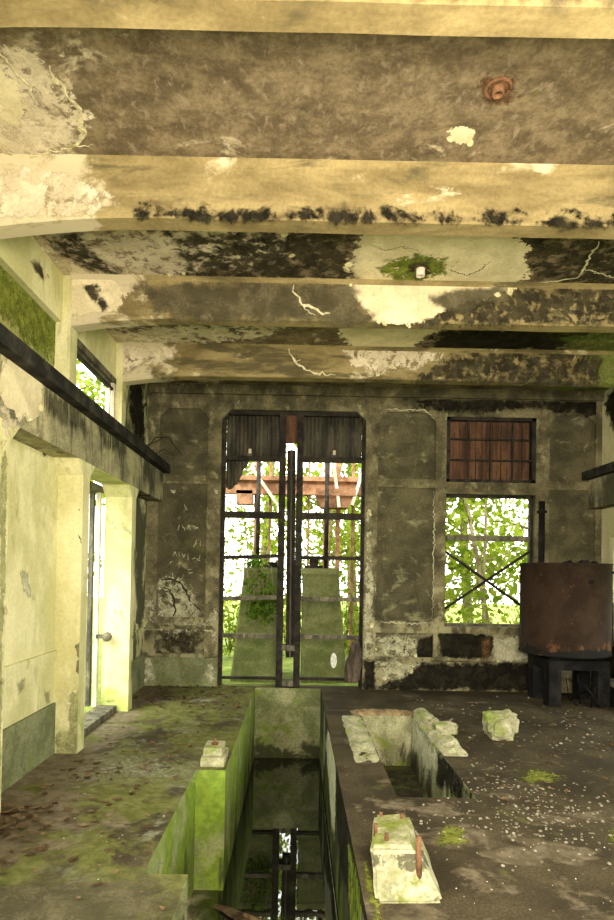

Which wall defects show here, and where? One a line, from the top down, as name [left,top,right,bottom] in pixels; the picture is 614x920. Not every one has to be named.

corrosion [478,76,514,105]
peeling [0,35,116,223]
damp [133,202,461,328]
crack [545,241,614,283]
crack [292,285,330,316]
peeling [337,234,534,377]
damp [416,208,614,388]
crack [288,349,335,376]
damp [386,389,614,429]
damp [381,495,436,625]
peeling [492,636,528,663]